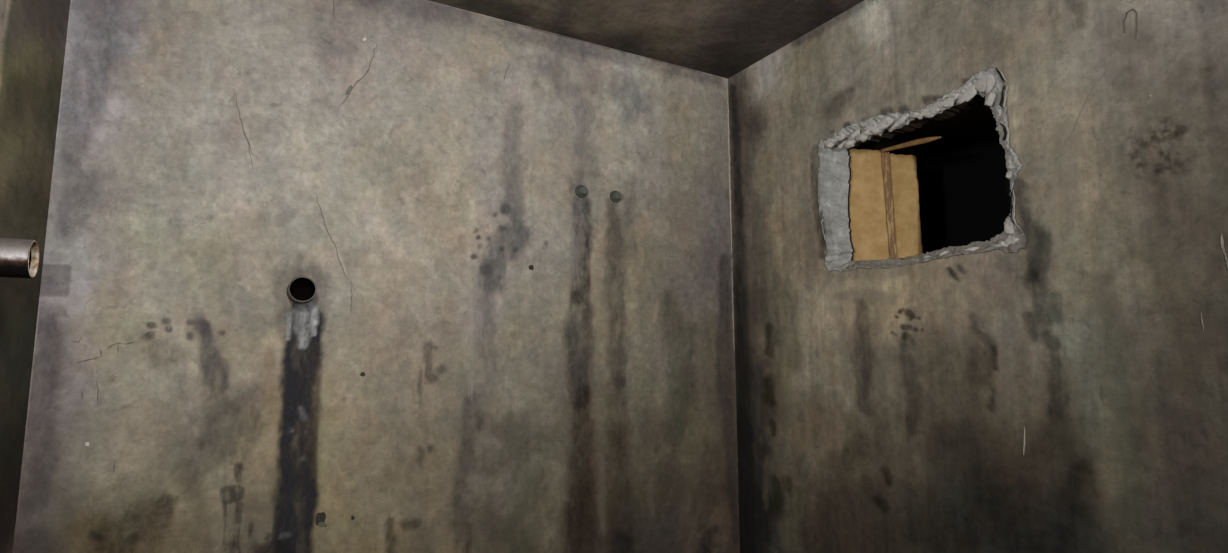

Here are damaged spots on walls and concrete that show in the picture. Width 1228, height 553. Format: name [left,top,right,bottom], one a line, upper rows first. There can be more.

spalling [817,67,1028,272]
damp [1016,182,1047,290]
damp [274,303,323,553]